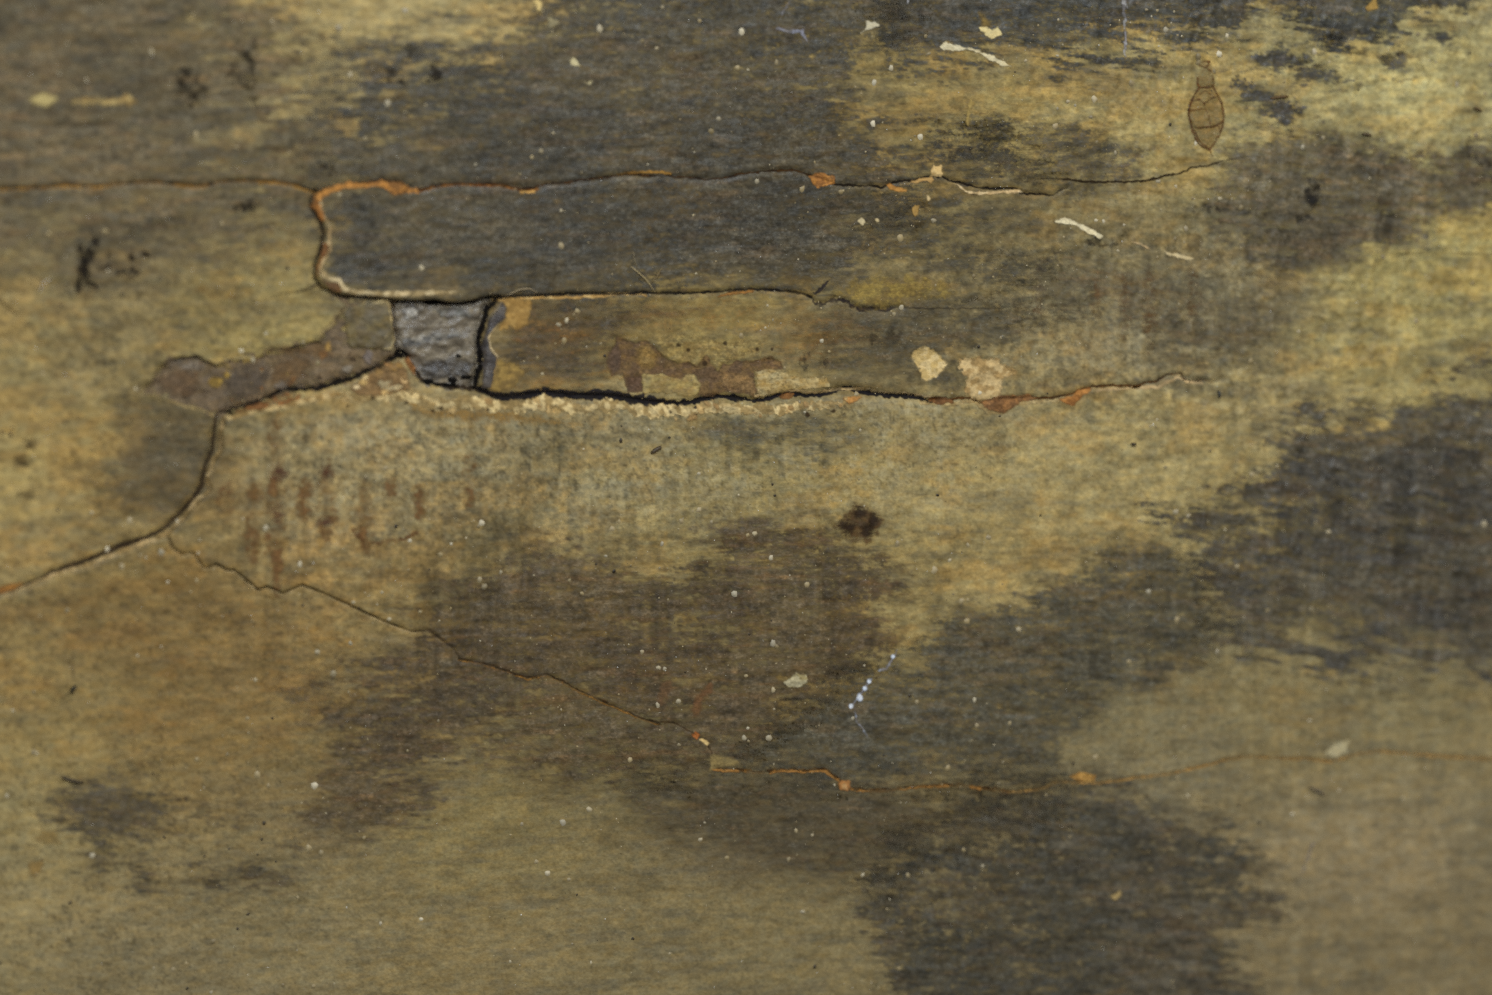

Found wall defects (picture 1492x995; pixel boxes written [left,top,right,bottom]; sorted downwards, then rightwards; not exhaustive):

spalling [138,293,532,419]
crack [0,161,1220,634]
damp [0,0,1492,391]
damp [38,771,187,893]
damp [283,352,1492,995]
crack [459,658,1492,793]